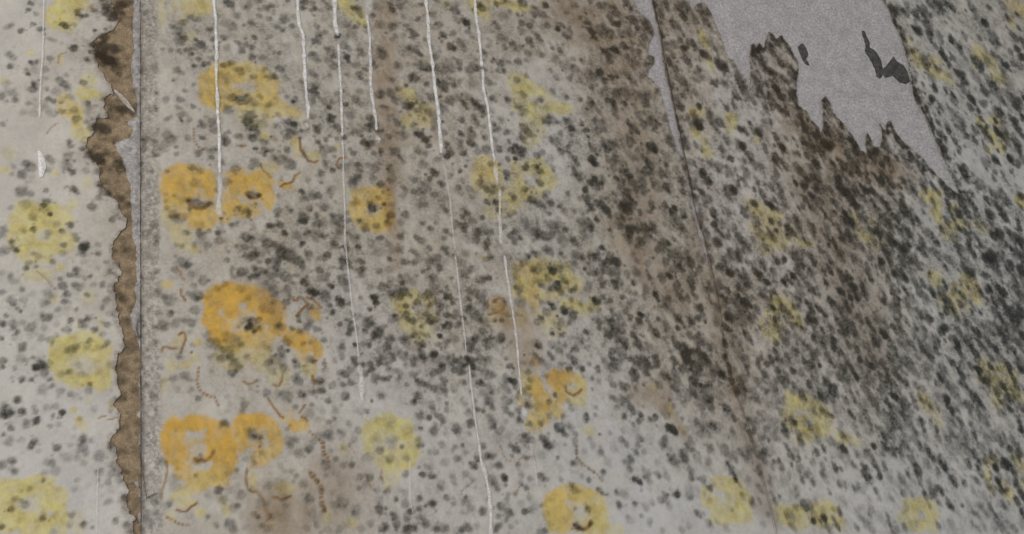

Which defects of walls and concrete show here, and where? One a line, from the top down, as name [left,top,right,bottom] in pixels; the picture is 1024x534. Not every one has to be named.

damp [70,0,132,74]
damp [82,145,123,172]
damp [91,118,115,144]
peeling [86,0,141,534]
damp [177,0,246,214]
damp [238,0,575,534]
damp [543,0,1024,525]
damp [0,398,39,424]